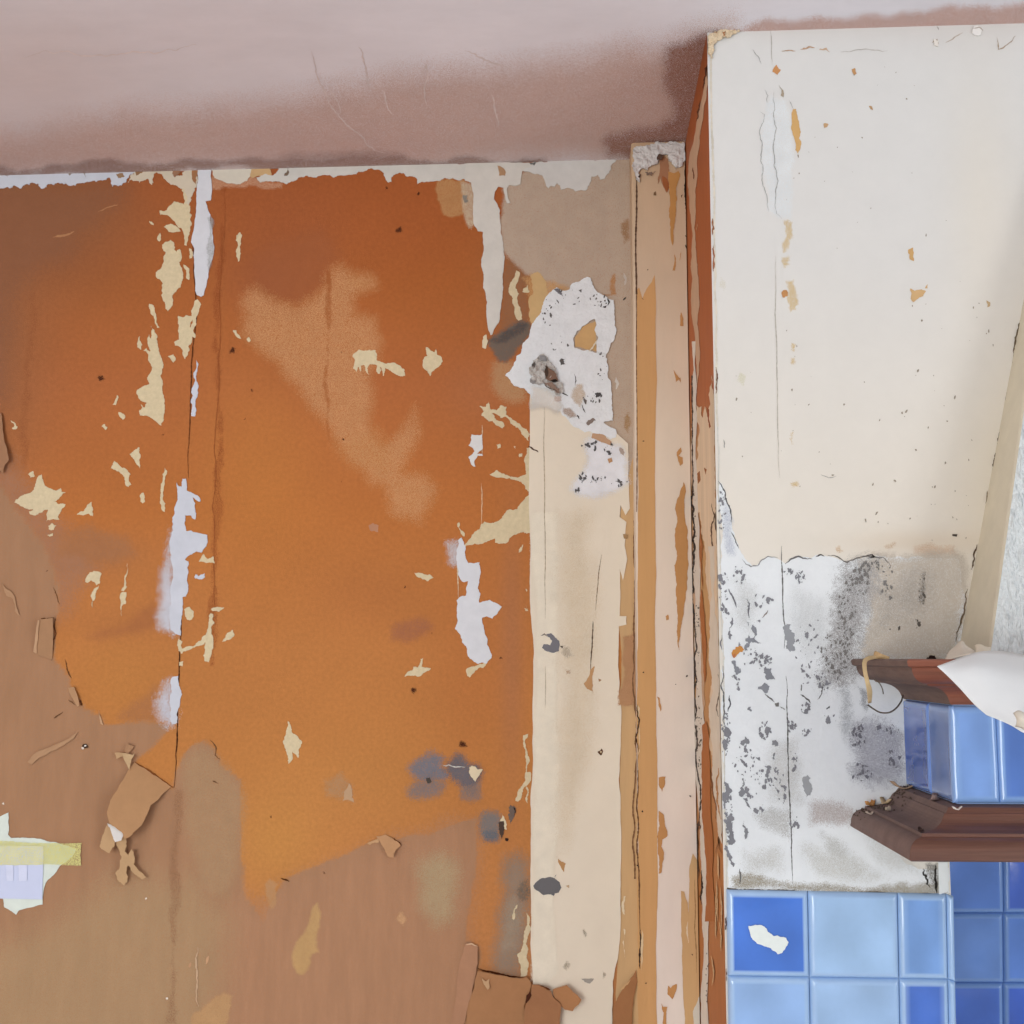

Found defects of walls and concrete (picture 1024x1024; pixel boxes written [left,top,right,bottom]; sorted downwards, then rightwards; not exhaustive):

damp [0,0,1024,414]
crack [759,92,793,214]
crack [176,619,184,681]
crack [187,188,228,666]
flaking render [0,141,685,1024]
damp [764,736,808,810]
flaking render [674,29,972,1024]
damp [727,835,950,894]
damp [787,541,956,793]